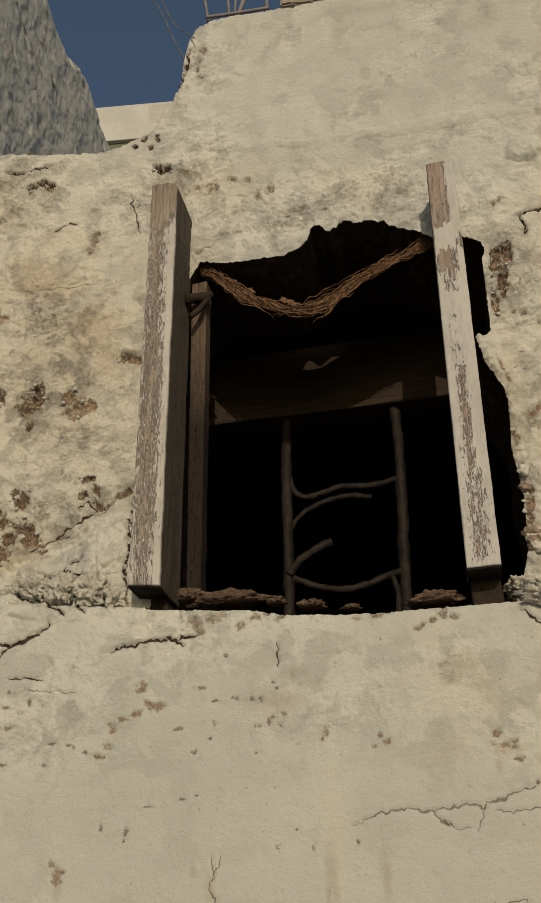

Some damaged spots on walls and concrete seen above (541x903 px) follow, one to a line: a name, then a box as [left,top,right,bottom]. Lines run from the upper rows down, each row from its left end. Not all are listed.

crack [519,208,541,234]
flaking render [488,237,512,315]
flaking render [0,382,97,432]
flaking render [0,489,48,567]
crack [30,501,133,591]
flaking render [78,473,134,513]
flaking render [521,485,537,524]
crack [0,561,85,657]
crack [110,635,198,653]
crack [9,677,76,694]
crack [352,782,541,831]
crack [209,856,221,903]